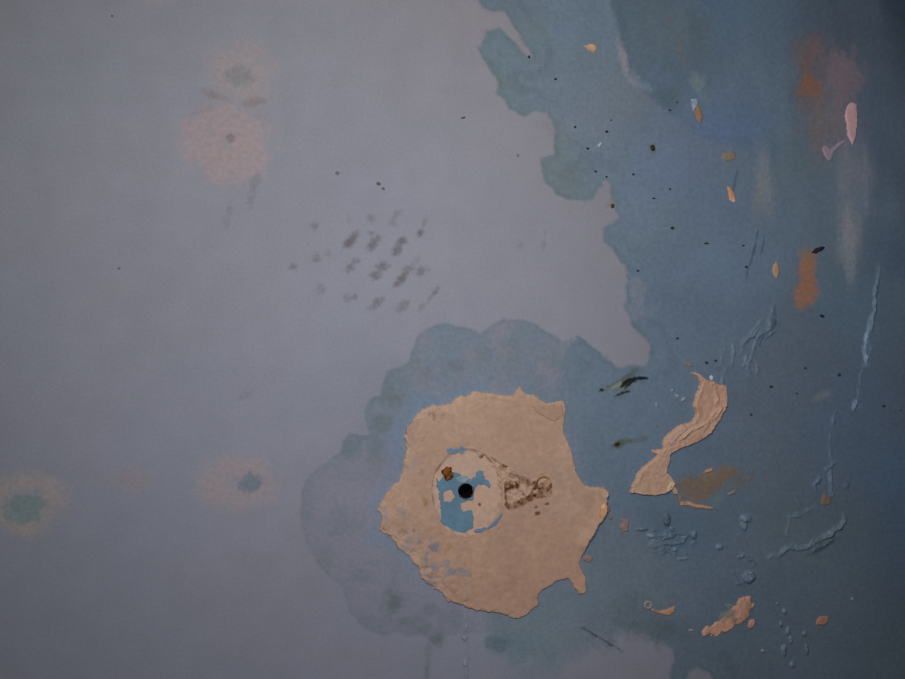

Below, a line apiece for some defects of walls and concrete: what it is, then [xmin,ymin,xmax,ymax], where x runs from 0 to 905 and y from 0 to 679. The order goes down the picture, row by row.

peeling [822,102,858,161]
damp [304,0,905,679]
corrosion [795,253,816,308]
flaking render [377,386,629,619]
flaking render [629,361,736,510]
peeling [688,596,756,638]